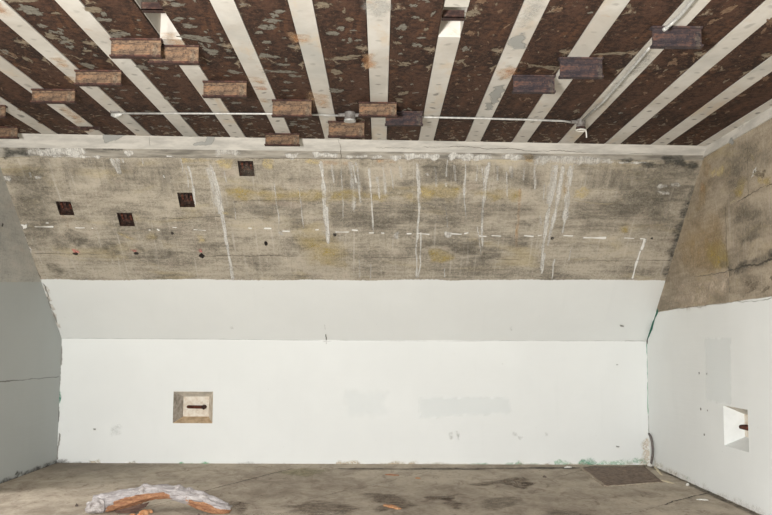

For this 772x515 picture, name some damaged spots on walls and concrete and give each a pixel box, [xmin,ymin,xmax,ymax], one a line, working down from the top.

peeling [173,17,236,65]
peeling [255,10,303,96]
peeling [326,7,362,44]
peeling [329,55,364,106]
peeling [393,0,436,66]
water stain [207,161,234,280]
water stain [307,159,402,255]
water stain [394,160,466,276]
water stain [444,162,516,251]
water stain [524,165,584,278]
water stain [663,155,697,169]
crack [646,241,772,430]